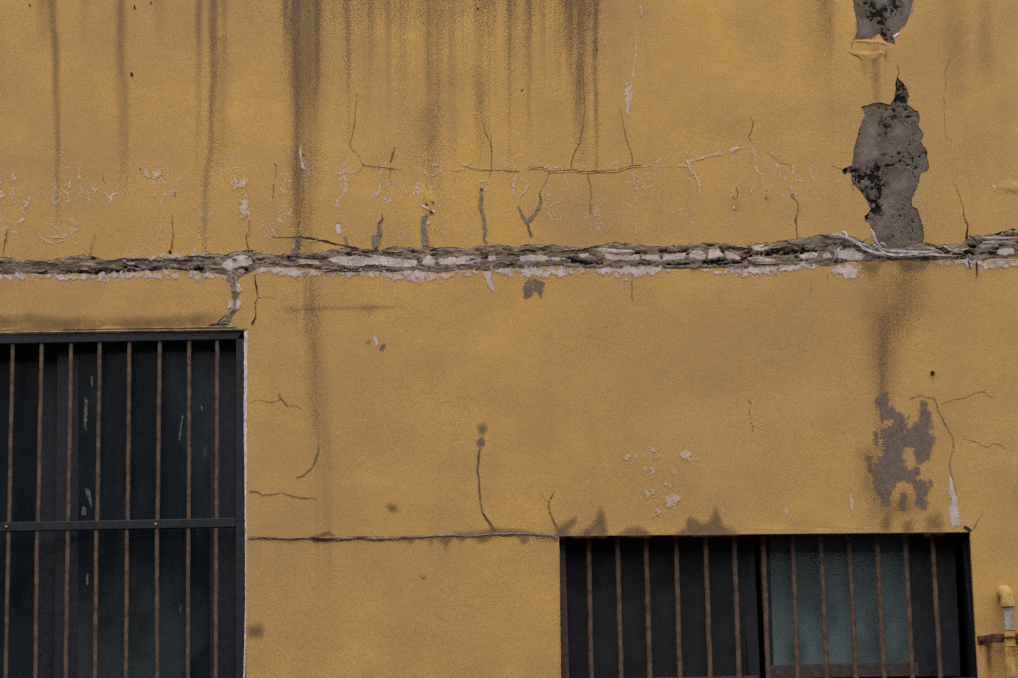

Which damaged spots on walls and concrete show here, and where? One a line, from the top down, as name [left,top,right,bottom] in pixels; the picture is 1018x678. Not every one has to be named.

flaking render [848,0,913,61]
crack [349,100,401,174]
crack [463,53,640,244]
flaking render [831,65,948,260]
crack [275,185,383,255]
crack [421,213,429,246]
crack [790,185,800,239]
crack [912,376,1006,495]
crack [247,443,559,544]